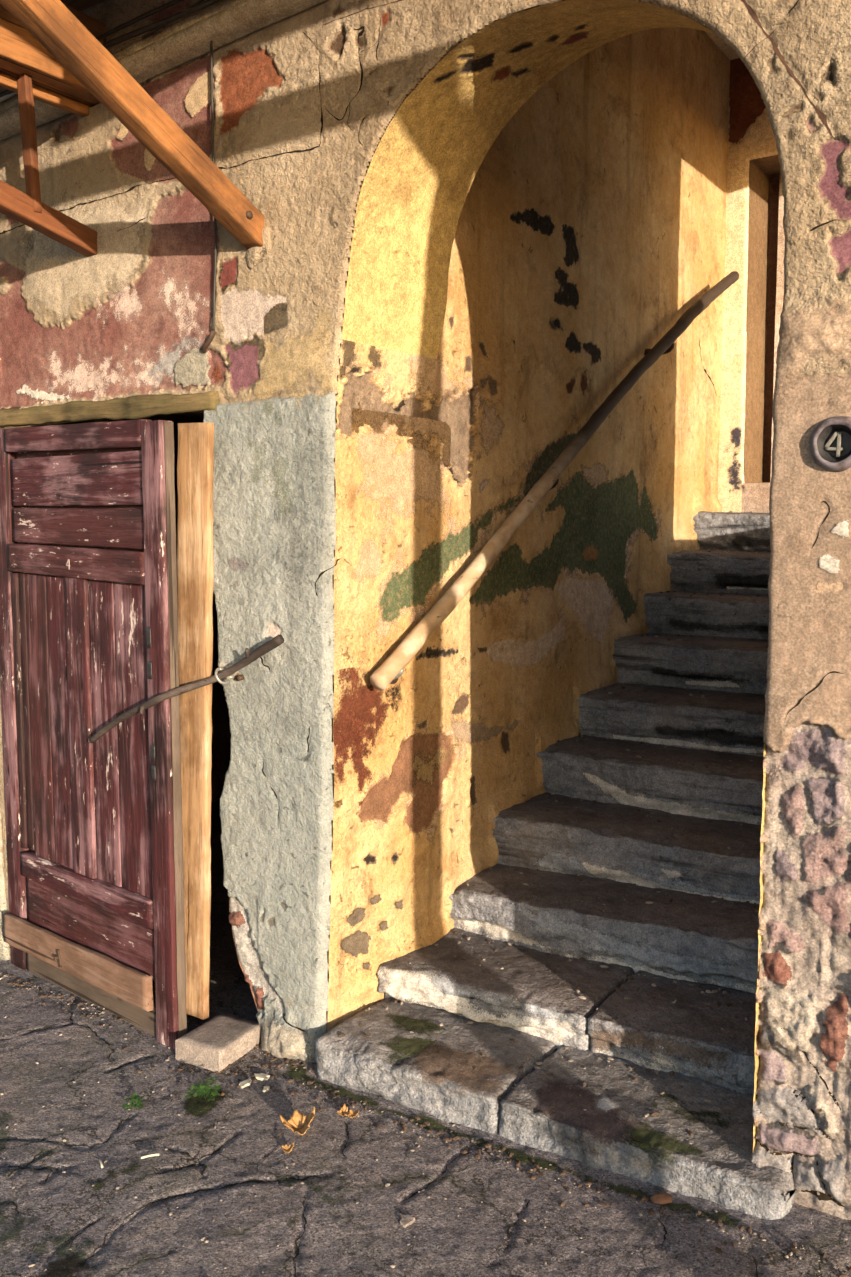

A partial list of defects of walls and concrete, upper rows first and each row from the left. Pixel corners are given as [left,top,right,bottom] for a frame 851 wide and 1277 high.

flaking render [141,46,283,157]
crack [218,0,401,169]
flaking render [728,58,766,144]
crack [742,0,835,140]
crack [58,178,176,212]
flaking render [0,123,288,408]
spalling [338,342,581,644]
peeling [469,464,661,623]
spalling [358,694,520,841]
spalling [228,897,305,1032]
spalling [341,894,403,970]
spalling [751,723,851,1220]